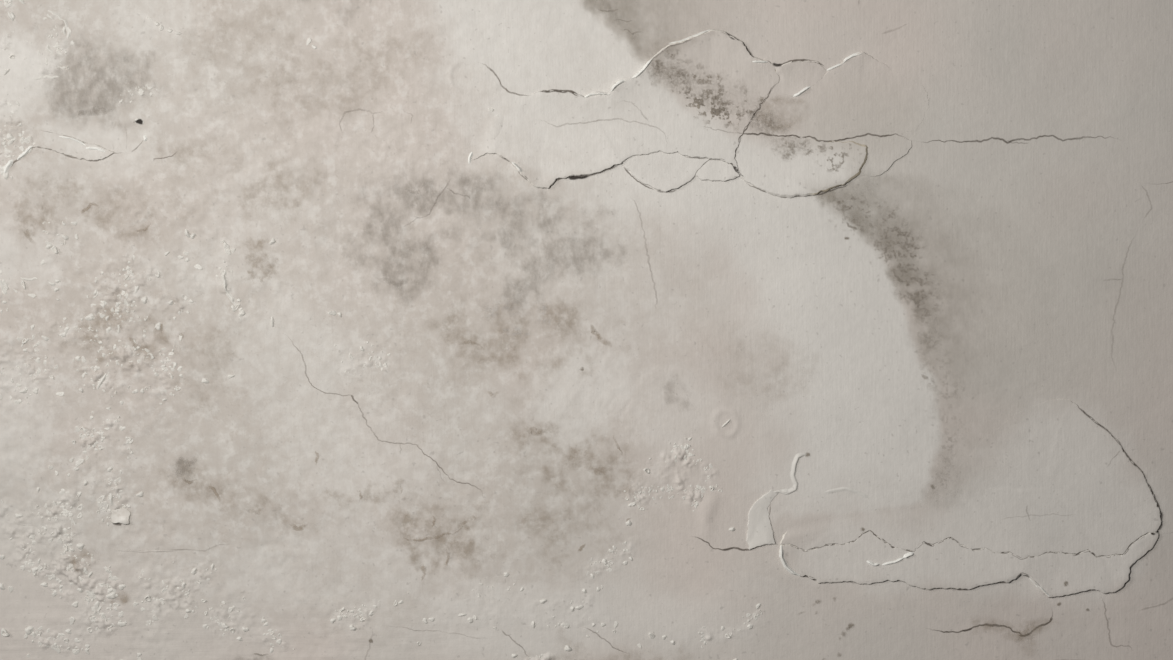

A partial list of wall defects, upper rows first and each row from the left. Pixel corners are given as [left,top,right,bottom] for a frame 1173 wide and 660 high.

peeling [468,29,929,198]
peeling [703,399,1162,598]
crack [941,619,1052,637]